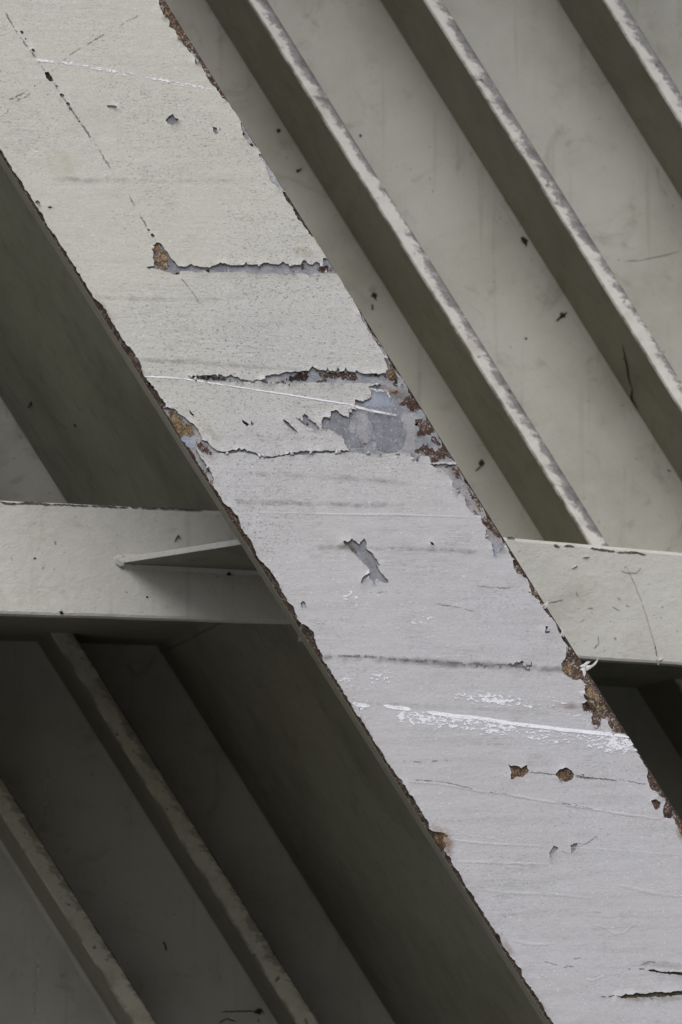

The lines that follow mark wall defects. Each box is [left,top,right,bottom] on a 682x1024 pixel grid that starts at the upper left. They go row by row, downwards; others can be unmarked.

rust [159,0,227,101]
peeling [147,243,335,277]
peeling [189,356,453,463]
peeling [163,407,217,485]
peeling [343,539,388,584]
rust [561,647,625,744]
leakage [383,704,637,754]
rust [509,765,528,779]
rust [555,768,574,782]
rust [639,756,682,836]
crack [601,961,682,999]